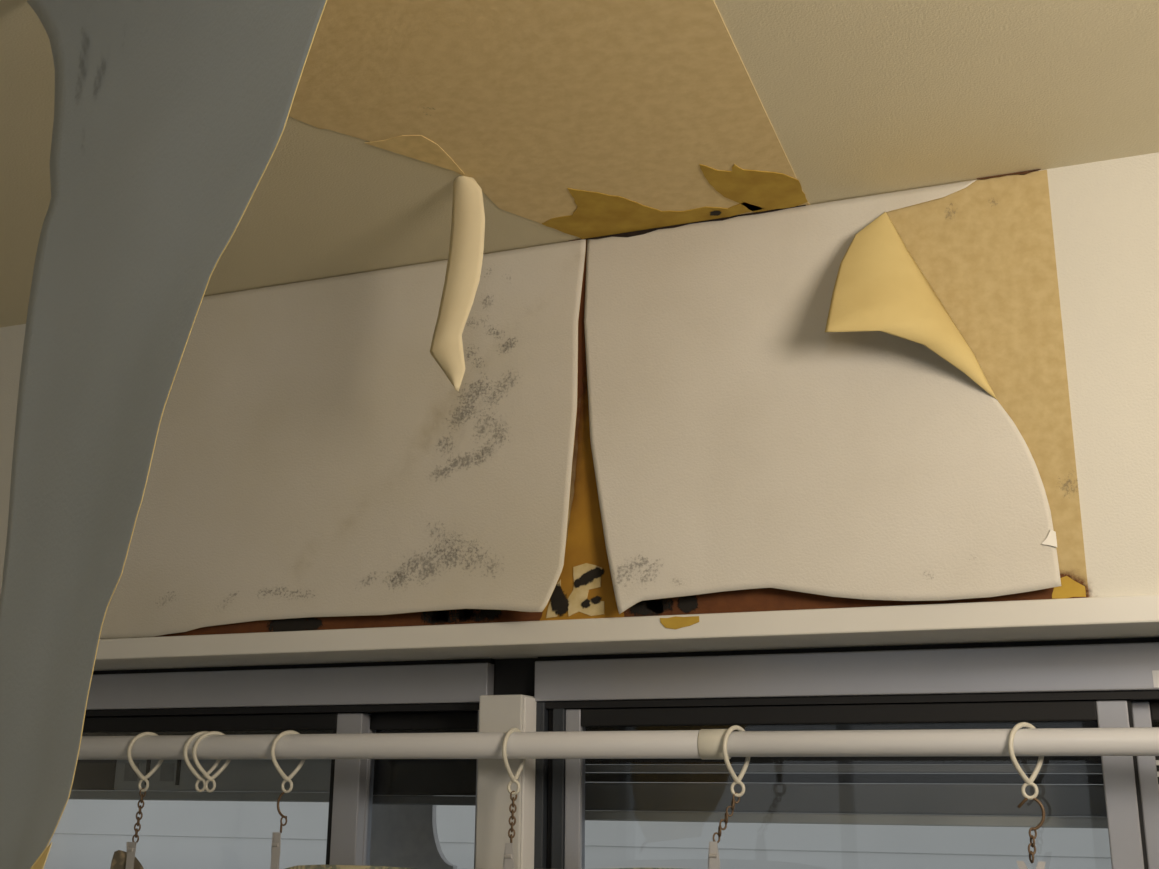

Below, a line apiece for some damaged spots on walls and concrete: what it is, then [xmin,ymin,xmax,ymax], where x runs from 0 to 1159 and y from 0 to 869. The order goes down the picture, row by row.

peeling [289,0,810,392]
peeling [540,378,624,621]
peeling [886,170,1088,599]